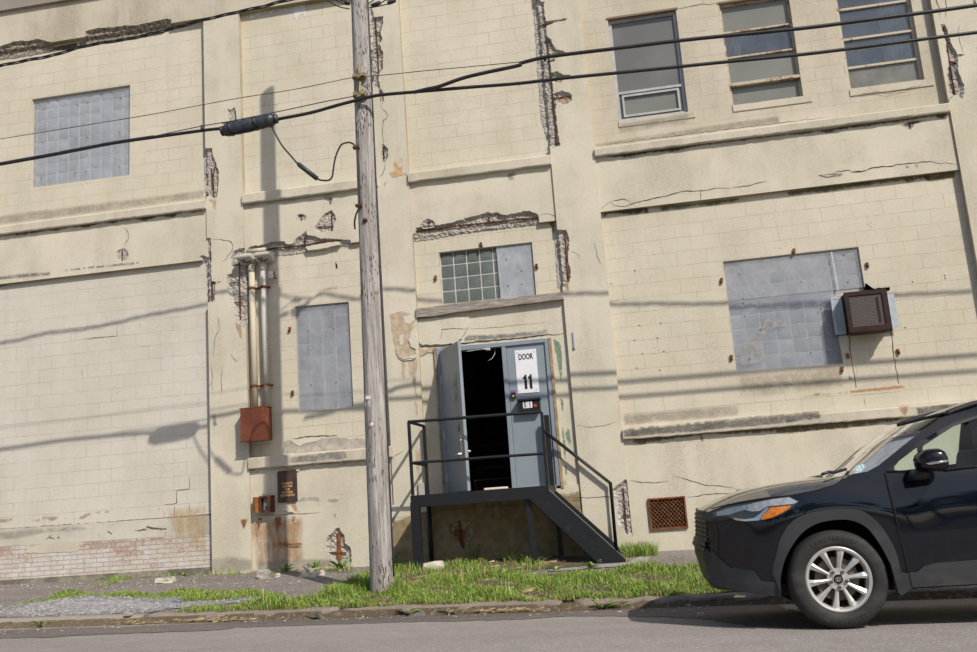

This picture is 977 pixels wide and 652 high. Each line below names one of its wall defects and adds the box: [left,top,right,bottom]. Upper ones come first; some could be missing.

spalling [0,39,55,60]
spalling [79,19,173,46]
spalling [369,4,384,105]
spalling [533,0,573,149]
spalling [940,24,965,99]
crack [819,161,952,177]
spalling [413,211,539,241]
spalling [200,196,352,329]
corrosion [241,509,302,558]
spalling [325,528,352,565]
peeling [392,500,587,564]
spalling [613,479,633,538]